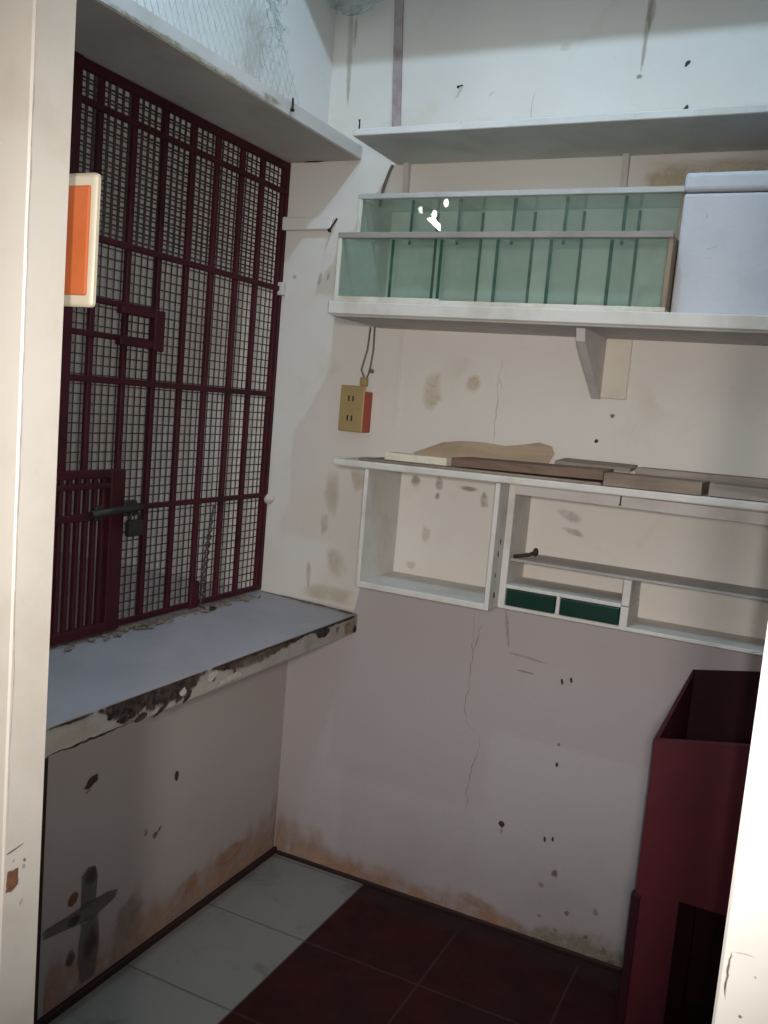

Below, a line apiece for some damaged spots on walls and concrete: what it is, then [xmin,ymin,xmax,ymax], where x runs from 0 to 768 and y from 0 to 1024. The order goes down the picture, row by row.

spalling [47,616,354,757]
water stain [43,825,428,1015]
water stain [446,902,520,930]
water stain [535,930,623,967]